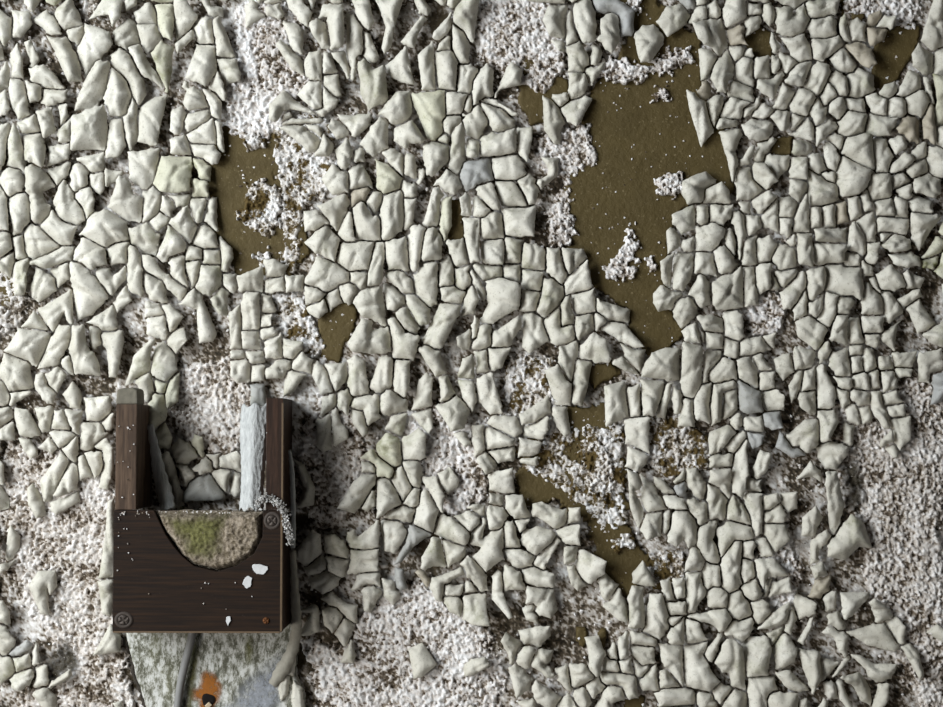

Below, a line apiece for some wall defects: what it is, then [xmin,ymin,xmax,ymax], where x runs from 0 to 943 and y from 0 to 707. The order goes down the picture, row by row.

peeling [921,0,943,51]
peeling [897,48,943,198]
peeling [0,0,144,409]
peeling [908,196,941,251]
peeling [107,0,936,640]
flaking render [0,395,136,707]
flaking render [786,321,943,707]
crack [120,634,146,707]
rust [192,671,221,707]
peeling [501,616,732,707]